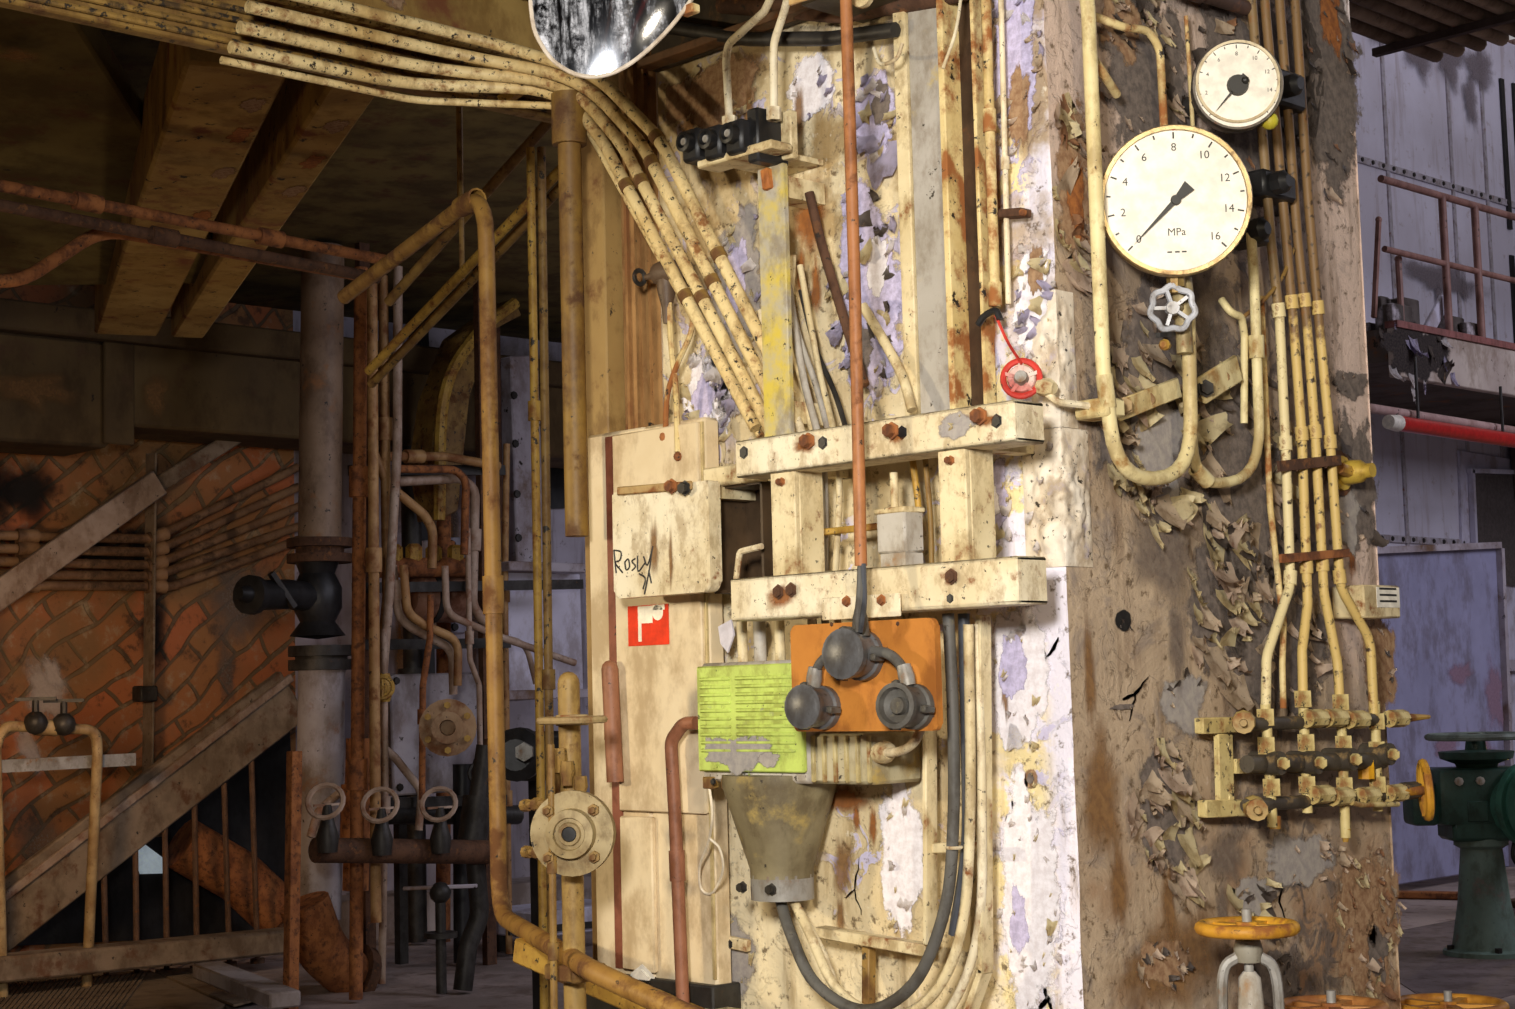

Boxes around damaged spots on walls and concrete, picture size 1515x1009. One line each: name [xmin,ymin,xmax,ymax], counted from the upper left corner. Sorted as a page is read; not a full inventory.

peeling [786,52,835,122]
peeling [824,69,903,409]
leakage [7,467,51,519]
peeling [980,0,1398,912]
peeling [991,605,1062,1009]
peeling [1137,939,1195,992]
peeling [1226,833,1407,1007]